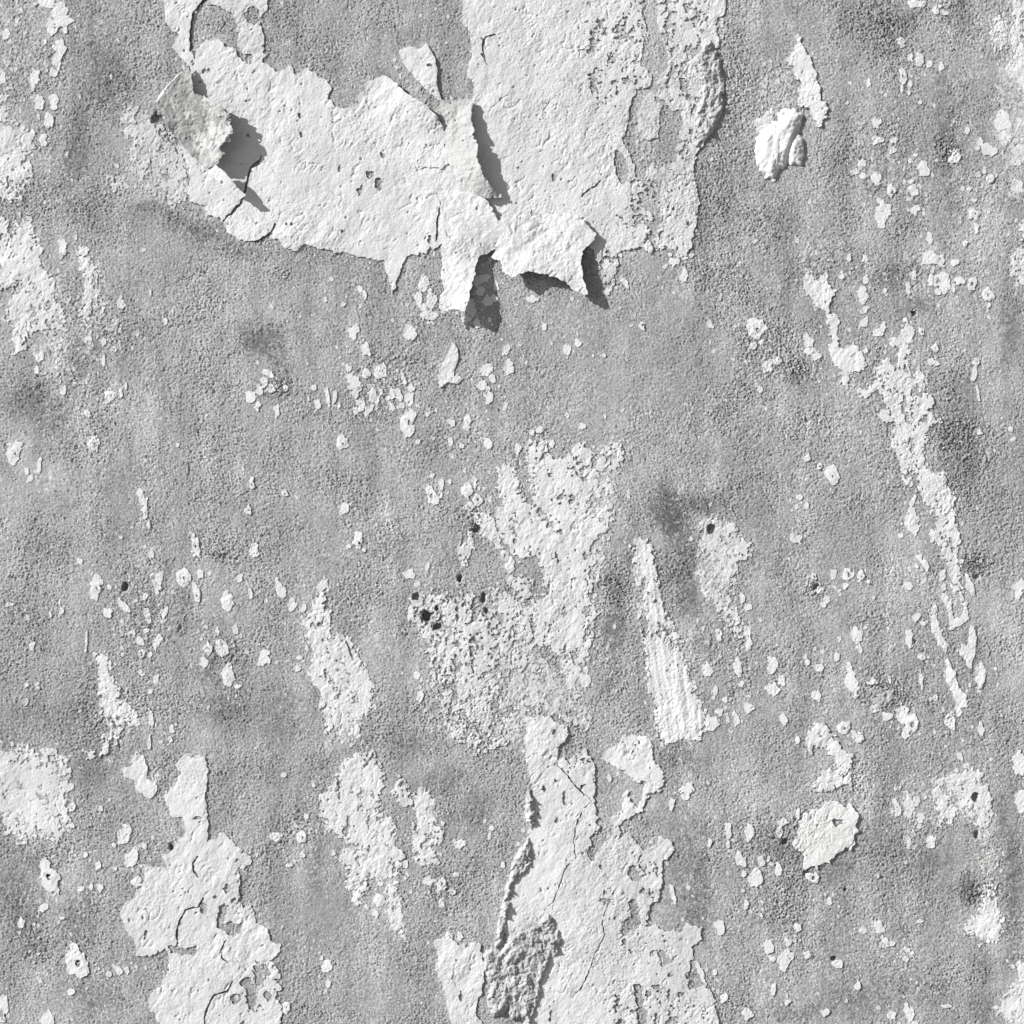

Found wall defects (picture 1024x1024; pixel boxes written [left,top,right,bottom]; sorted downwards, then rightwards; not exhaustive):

peeling [0,0,126,399]
peeling [103,0,726,340]
peeling [797,232,997,739]
peeling [0,625,290,1024]
crack [204,940,233,1024]
peeling [275,577,466,943]
peeling [407,423,755,1024]
peeling [725,822,783,910]
peeling [765,656,785,696]
peeling [776,721,864,883]
peeling [1011,750,1024,776]
peeling [1014,790,1024,813]